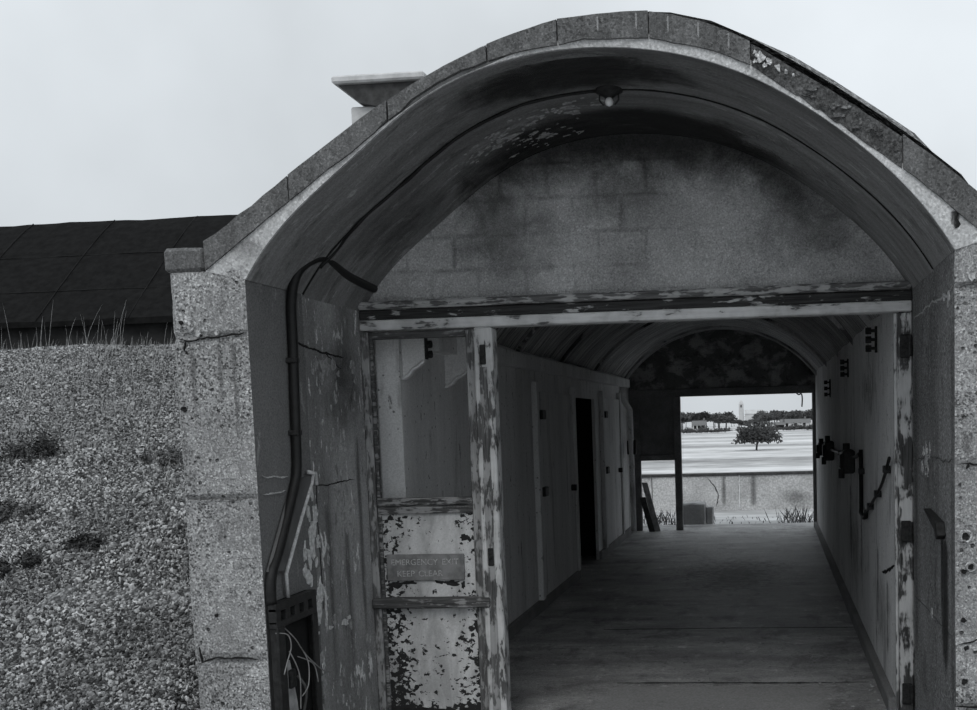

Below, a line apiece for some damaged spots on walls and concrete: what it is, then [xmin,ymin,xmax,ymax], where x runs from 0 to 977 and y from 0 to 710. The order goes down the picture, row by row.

peeling [450,96,605,172]
crack [180,329,244,355]
crack [298,342,343,369]
crack [916,455,977,469]
peeling [386,575,417,592]
peeling [435,580,465,589]
crack [199,647,257,664]